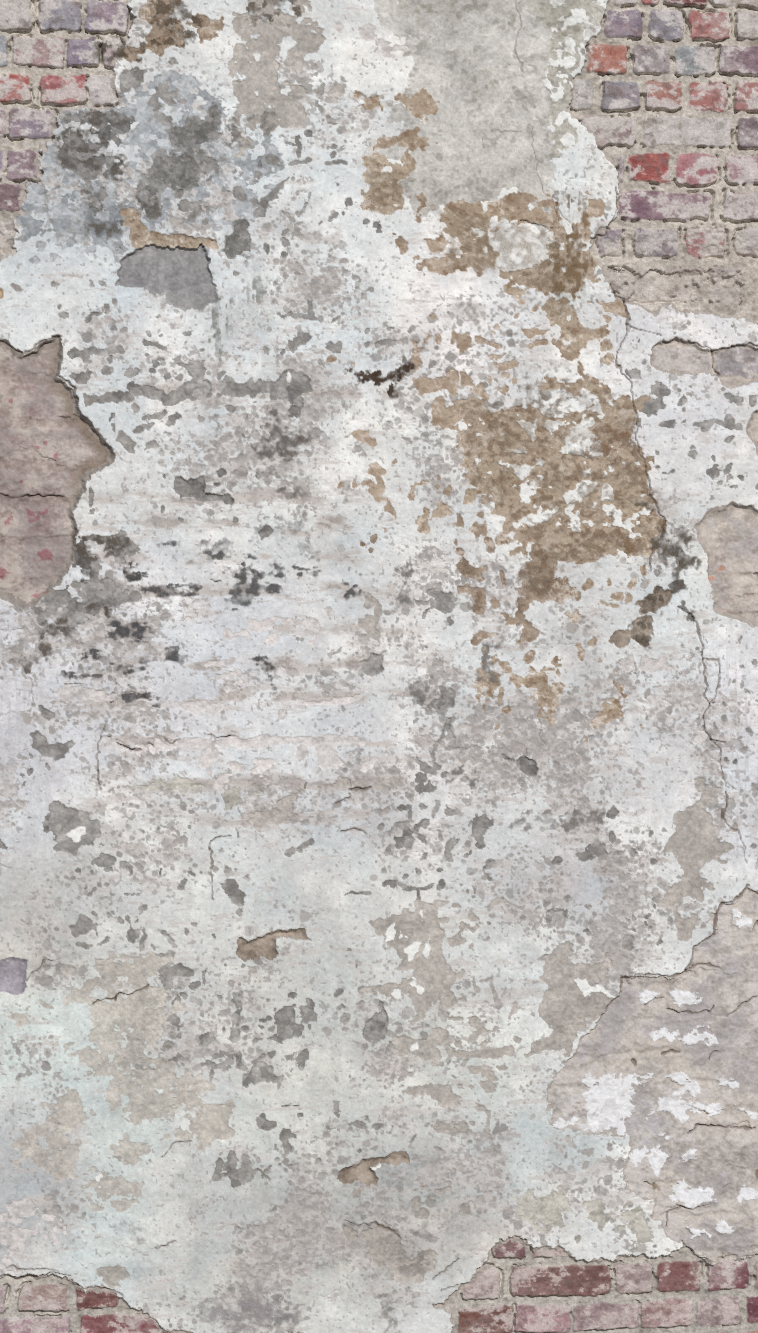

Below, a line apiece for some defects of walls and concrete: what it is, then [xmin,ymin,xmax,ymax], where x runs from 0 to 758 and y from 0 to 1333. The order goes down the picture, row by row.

crack [0,493,65,501]
crack [0,335,105,447]
crack [610,284,758,573]
peeling [0,801,318,1213]
flaking render [333,686,758,1333]
flaking render [0,1199,193,1333]